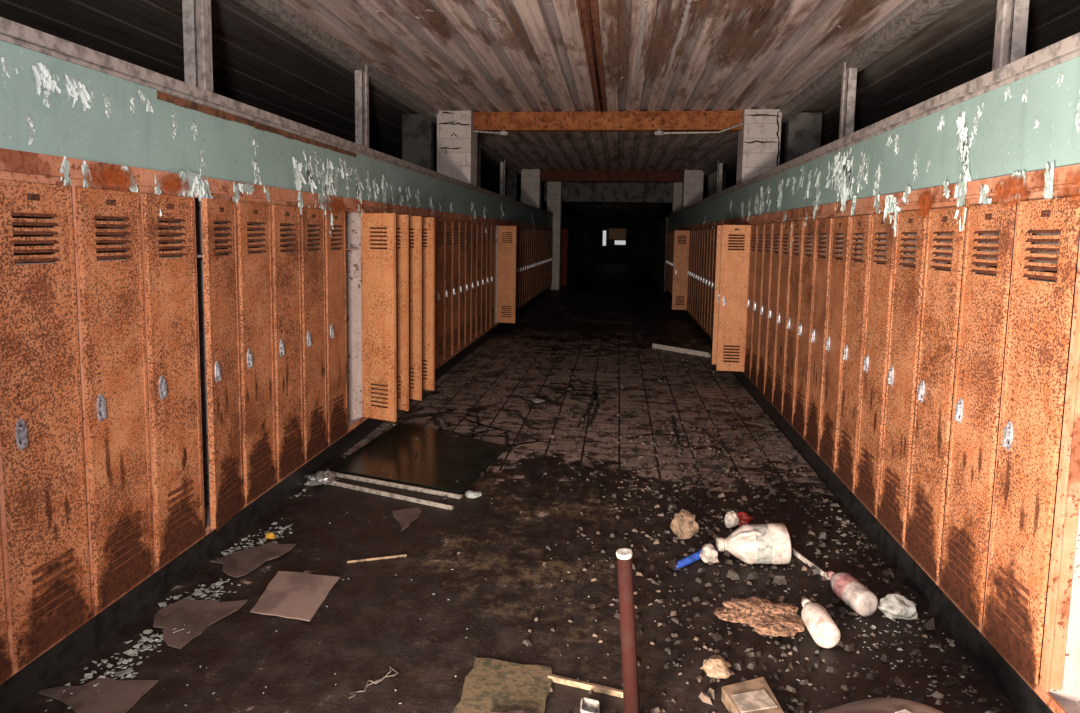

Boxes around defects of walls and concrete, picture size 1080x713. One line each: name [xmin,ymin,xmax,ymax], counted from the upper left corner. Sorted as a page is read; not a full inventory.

peeling [31,63,111,118]
peeling [60,156,90,188]
corrosion [86,167,133,191]
peeling [120,166,138,192]
corrosion [163,174,188,194]
spalling [130,90,453,237]
corrosion [917,192,931,219]
peeling [938,103,992,231]
corrosion [996,177,1027,206]
peeling [1043,162,1057,204]
corrosion [0,354,348,683]
corrosion [744,332,1039,690]